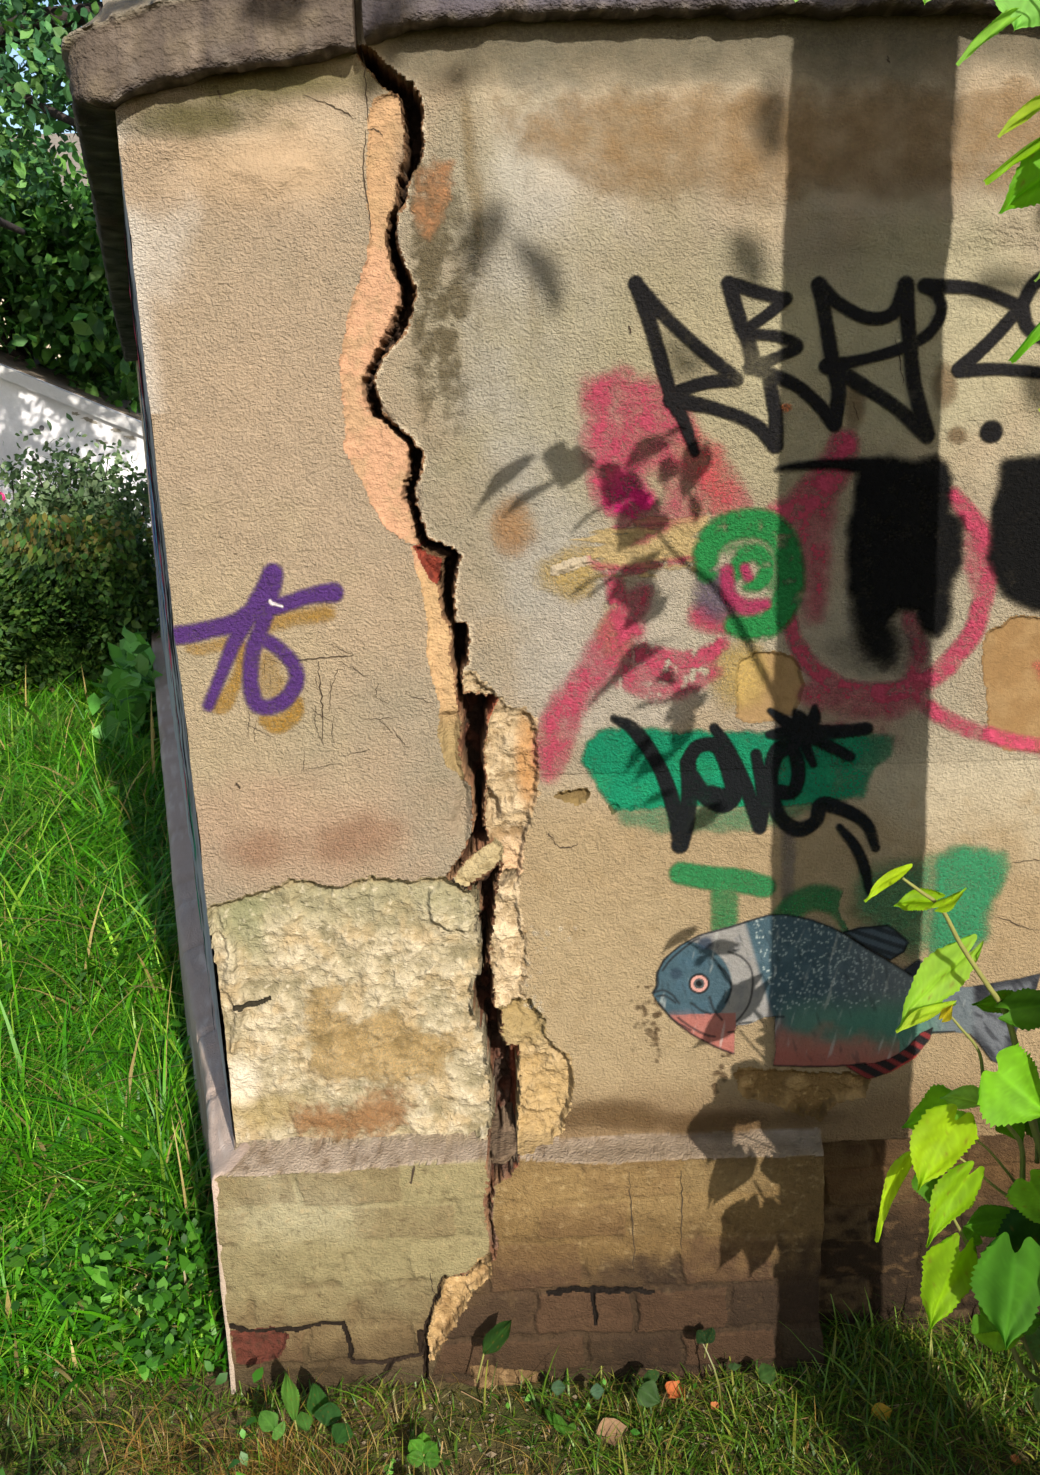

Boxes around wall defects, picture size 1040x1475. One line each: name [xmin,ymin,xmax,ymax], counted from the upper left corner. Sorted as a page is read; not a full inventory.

crack [229,42,521,1384]
flaking render [207,92,591,1156]
peeling [716,647,762,701]
flaking render [733,1067,871,1122]
flaking render [422,1253,492,1361]